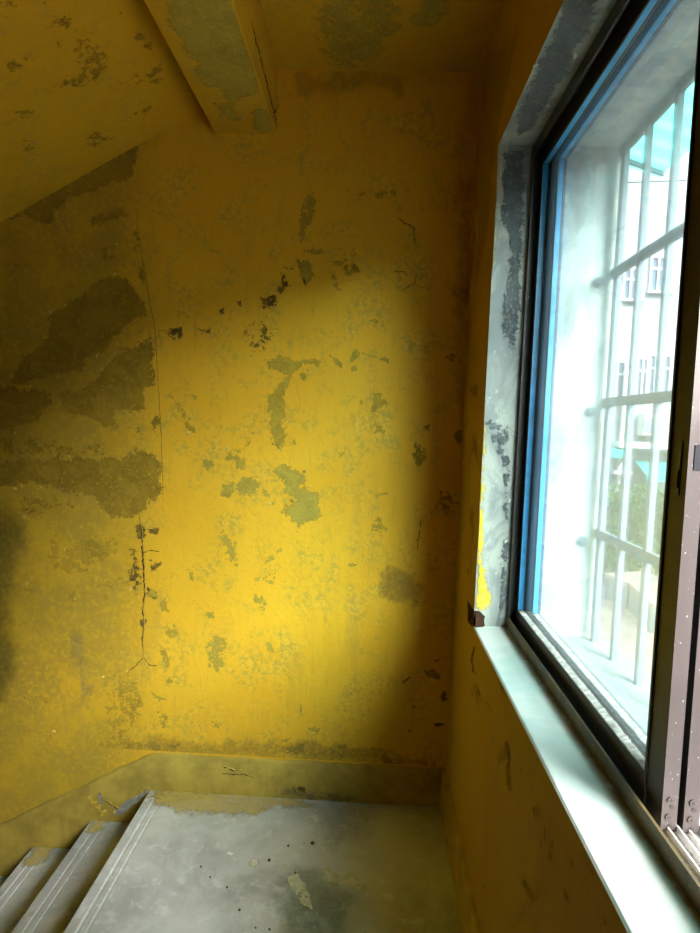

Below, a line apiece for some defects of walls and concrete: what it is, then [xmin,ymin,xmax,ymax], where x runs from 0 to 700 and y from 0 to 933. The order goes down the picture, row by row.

peeling [243,192,389,452]
peeling [200,432,322,532]
crack [130,515,159,670]
spalling [113,787,150,815]